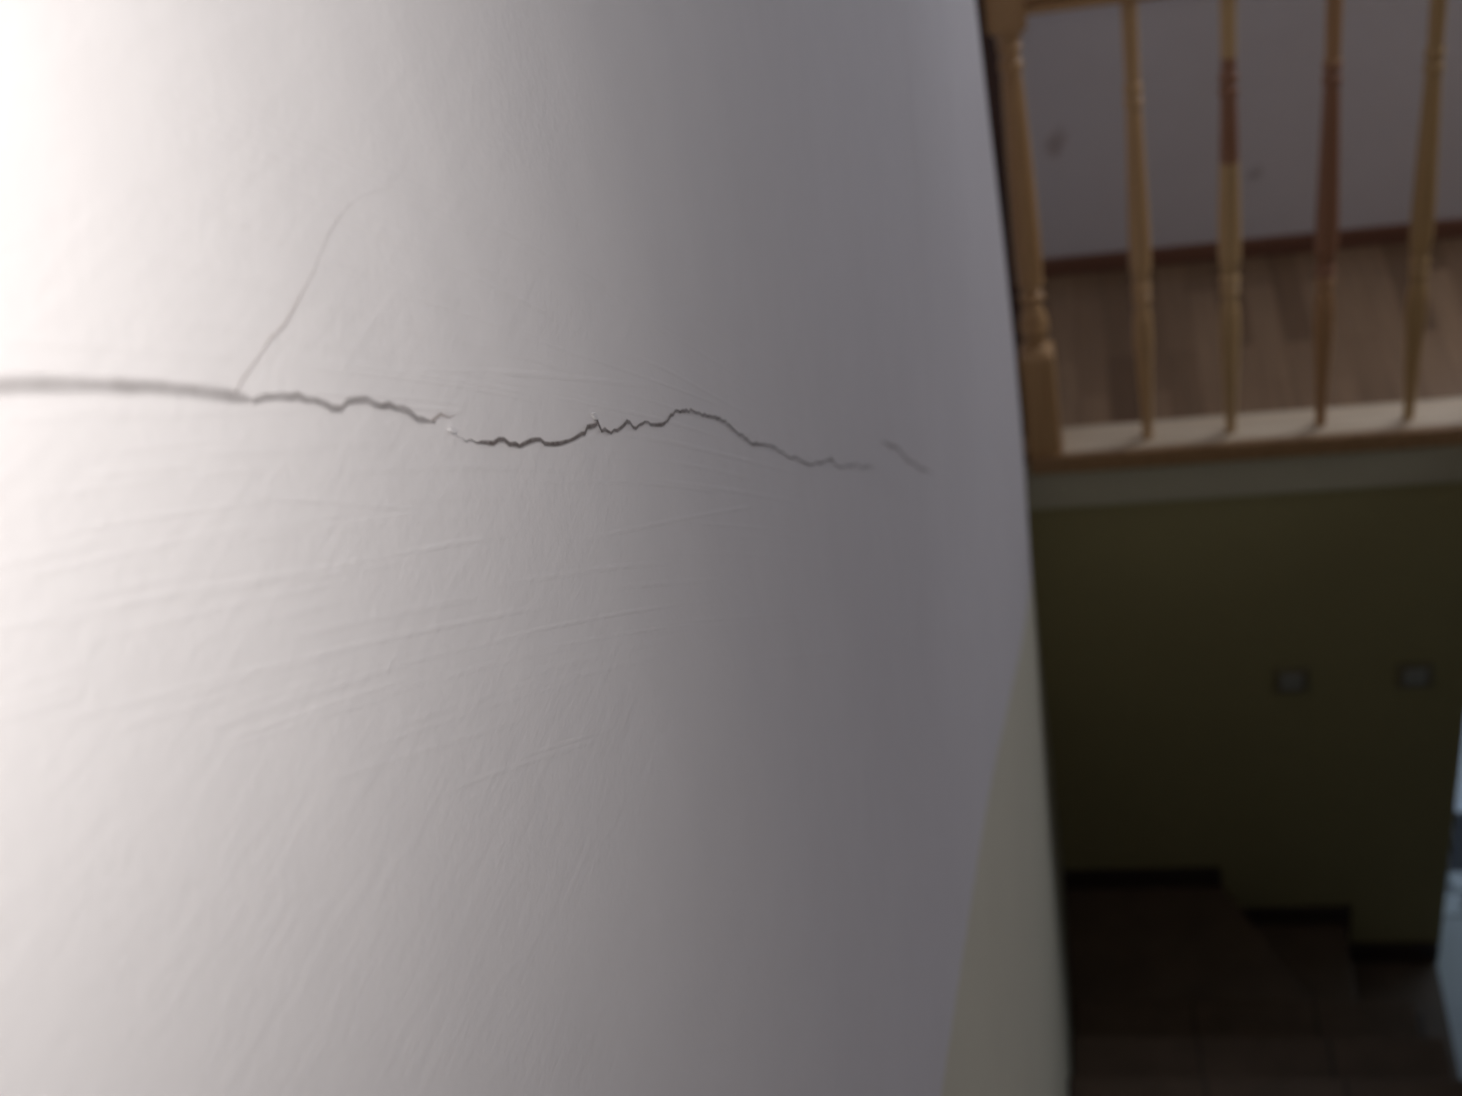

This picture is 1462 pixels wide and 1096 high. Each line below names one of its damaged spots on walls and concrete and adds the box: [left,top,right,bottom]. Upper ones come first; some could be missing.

crack [447,409,833,466]